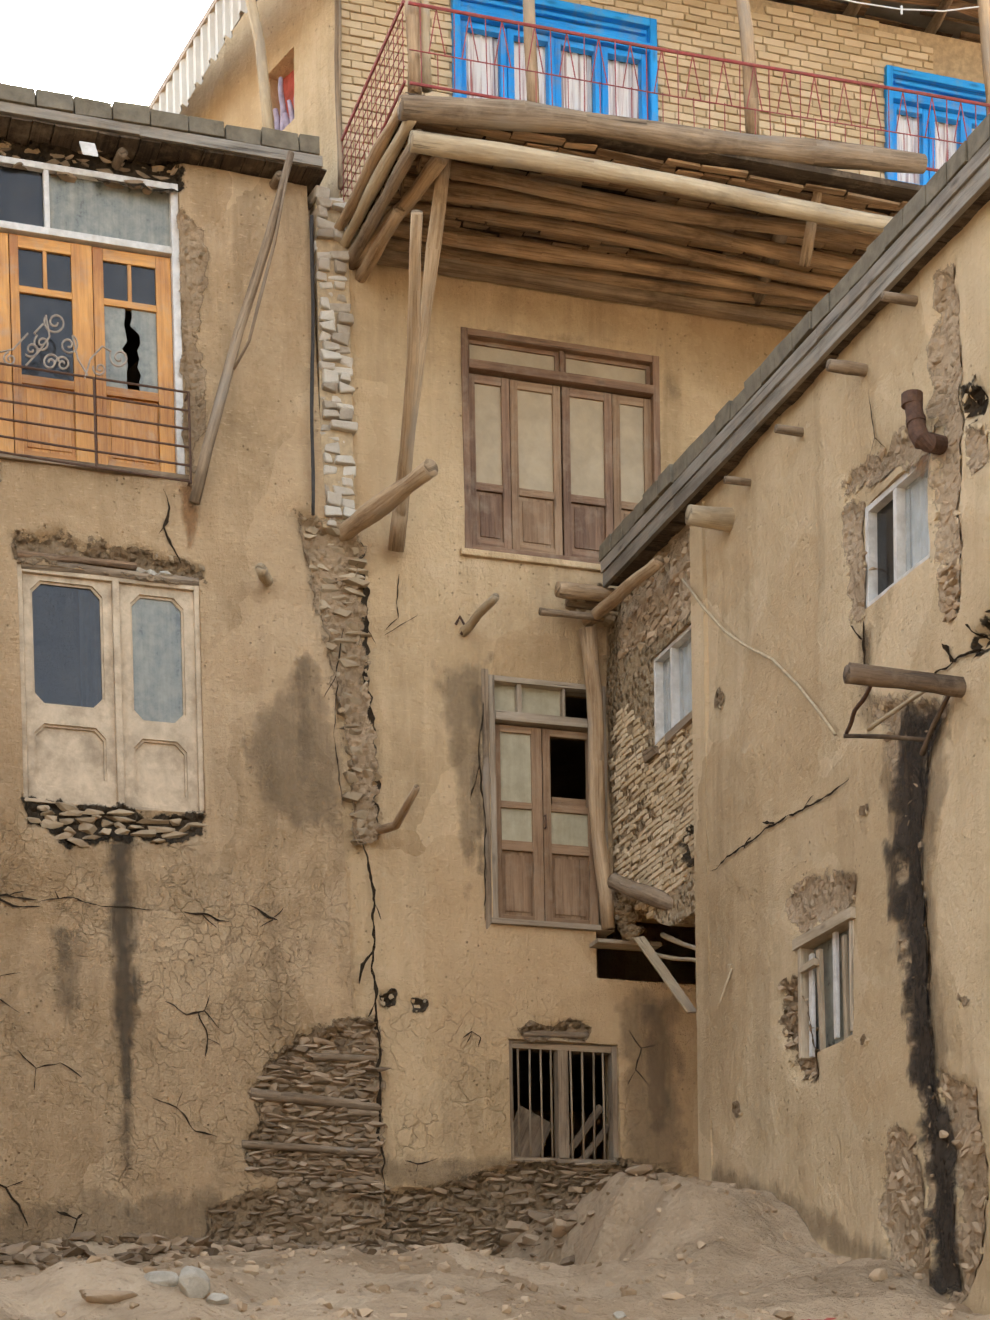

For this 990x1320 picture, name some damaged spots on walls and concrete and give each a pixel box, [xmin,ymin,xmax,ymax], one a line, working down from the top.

spalling [841,263,990,624]
crack [910,610,990,693]
crack [0,891,148,910]
water stain [110,843,141,1131]
crack [185,905,284,927]
spalling [242,988,429,1200]
crack [324,542,437,1186]
crack [712,780,848,871]
spalling [778,975,820,1082]
flaking render [878,1125,933,1286]
water stain [883,700,961,1293]
flaking render [937,1069,989,1304]